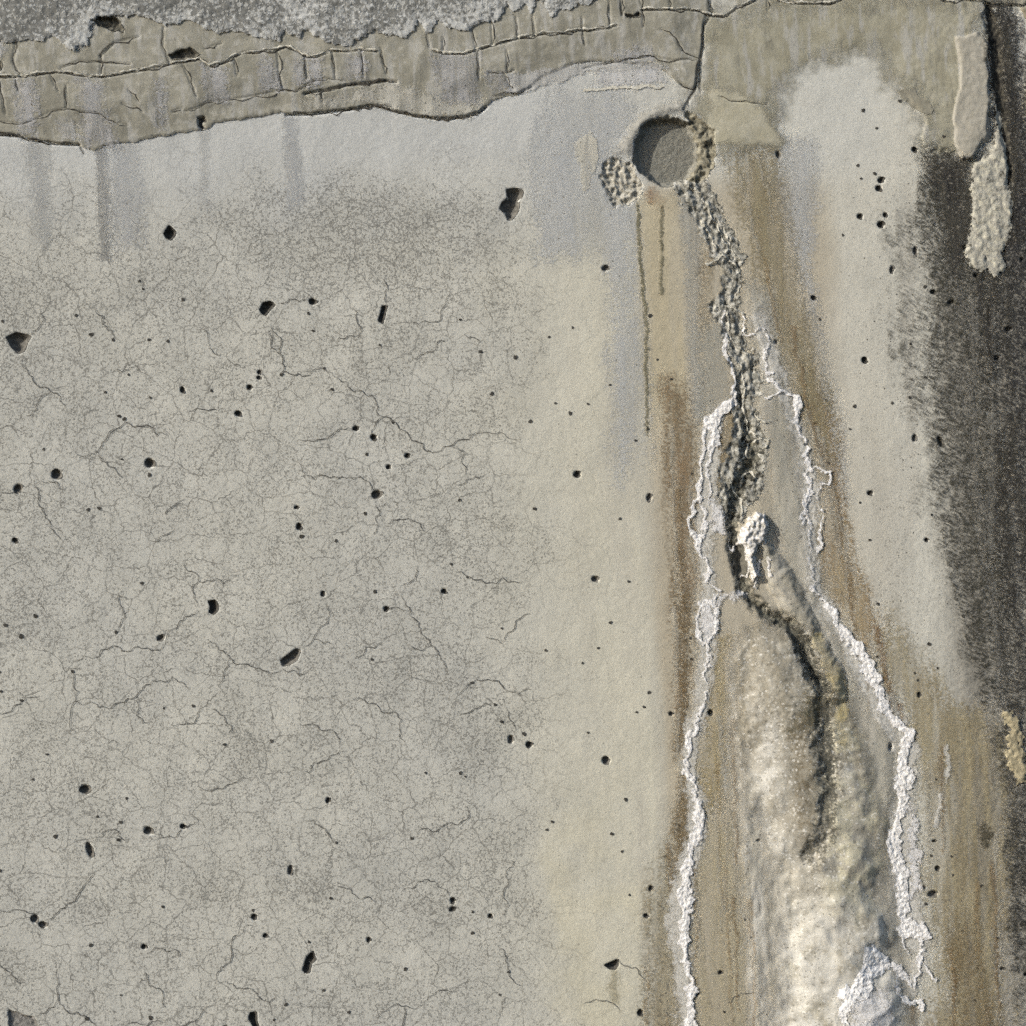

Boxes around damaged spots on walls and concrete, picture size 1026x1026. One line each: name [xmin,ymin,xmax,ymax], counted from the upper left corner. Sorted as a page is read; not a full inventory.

crack [0,0,842,155]
peeling [0,0,993,164]
spalling [600,157,642,208]
damp [774,137,821,342]
crack [269,326,518,485]
crack [302,469,423,534]
damp [886,0,1026,1017]
crack [69,565,330,731]
crack [388,566,531,733]
damp [663,195,938,1026]
peeling [8,1009,39,1026]
crack [125,925,278,1026]